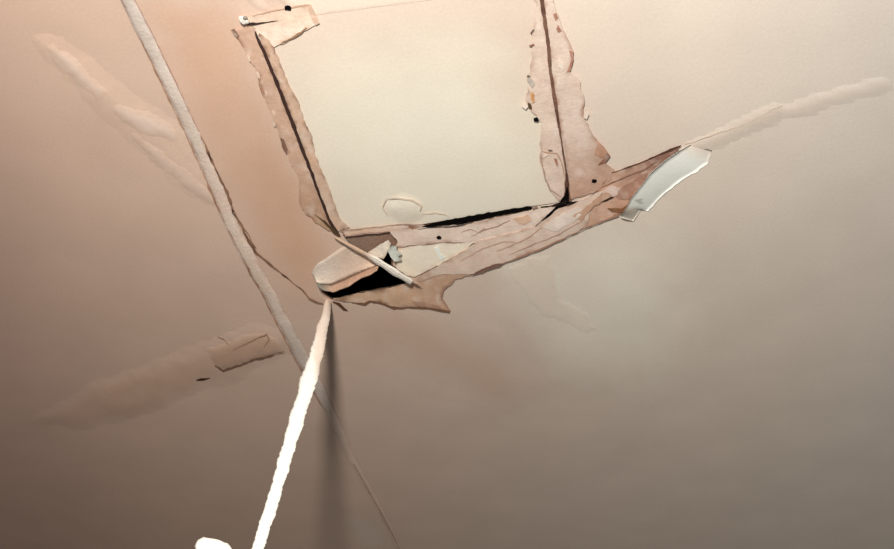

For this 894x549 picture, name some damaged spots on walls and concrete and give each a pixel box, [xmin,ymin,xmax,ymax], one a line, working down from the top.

peeling [595,141,610,165]
peeling [620,145,712,221]
crack [200,135,348,311]
spalling [312,234,406,300]